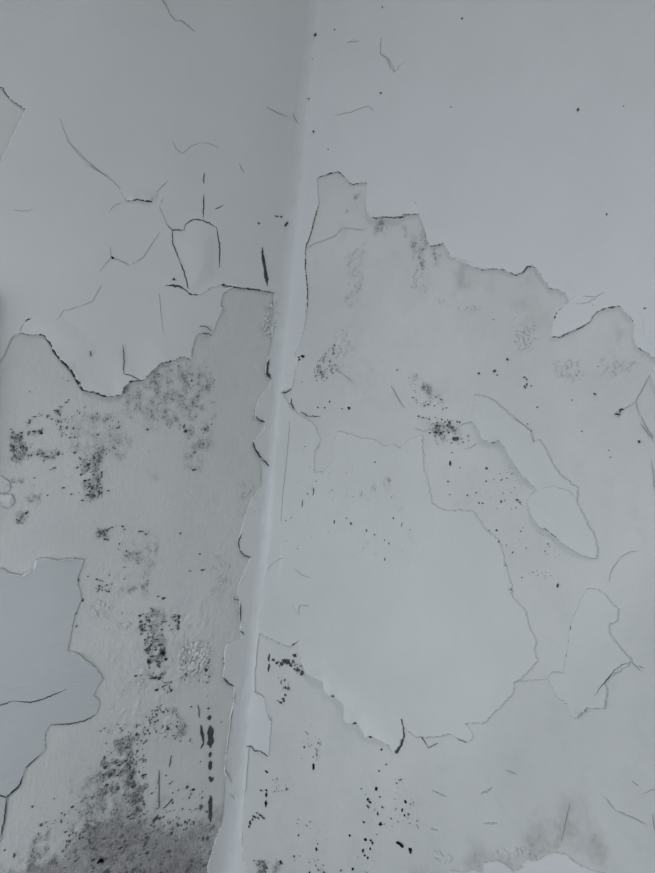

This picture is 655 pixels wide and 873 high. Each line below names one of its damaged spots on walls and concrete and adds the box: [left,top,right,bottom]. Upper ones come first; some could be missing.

crack [55,119,168,321]
crack [261,247,269,286]
water stain [9,399,120,501]
water stain [408,377,469,468]
peeling [0,272,283,873]
peeling [242,171,655,873]
water stain [135,608,180,694]
water stain [267,654,304,705]
water stain [29,704,221,873]
water stain [361,787,418,859]